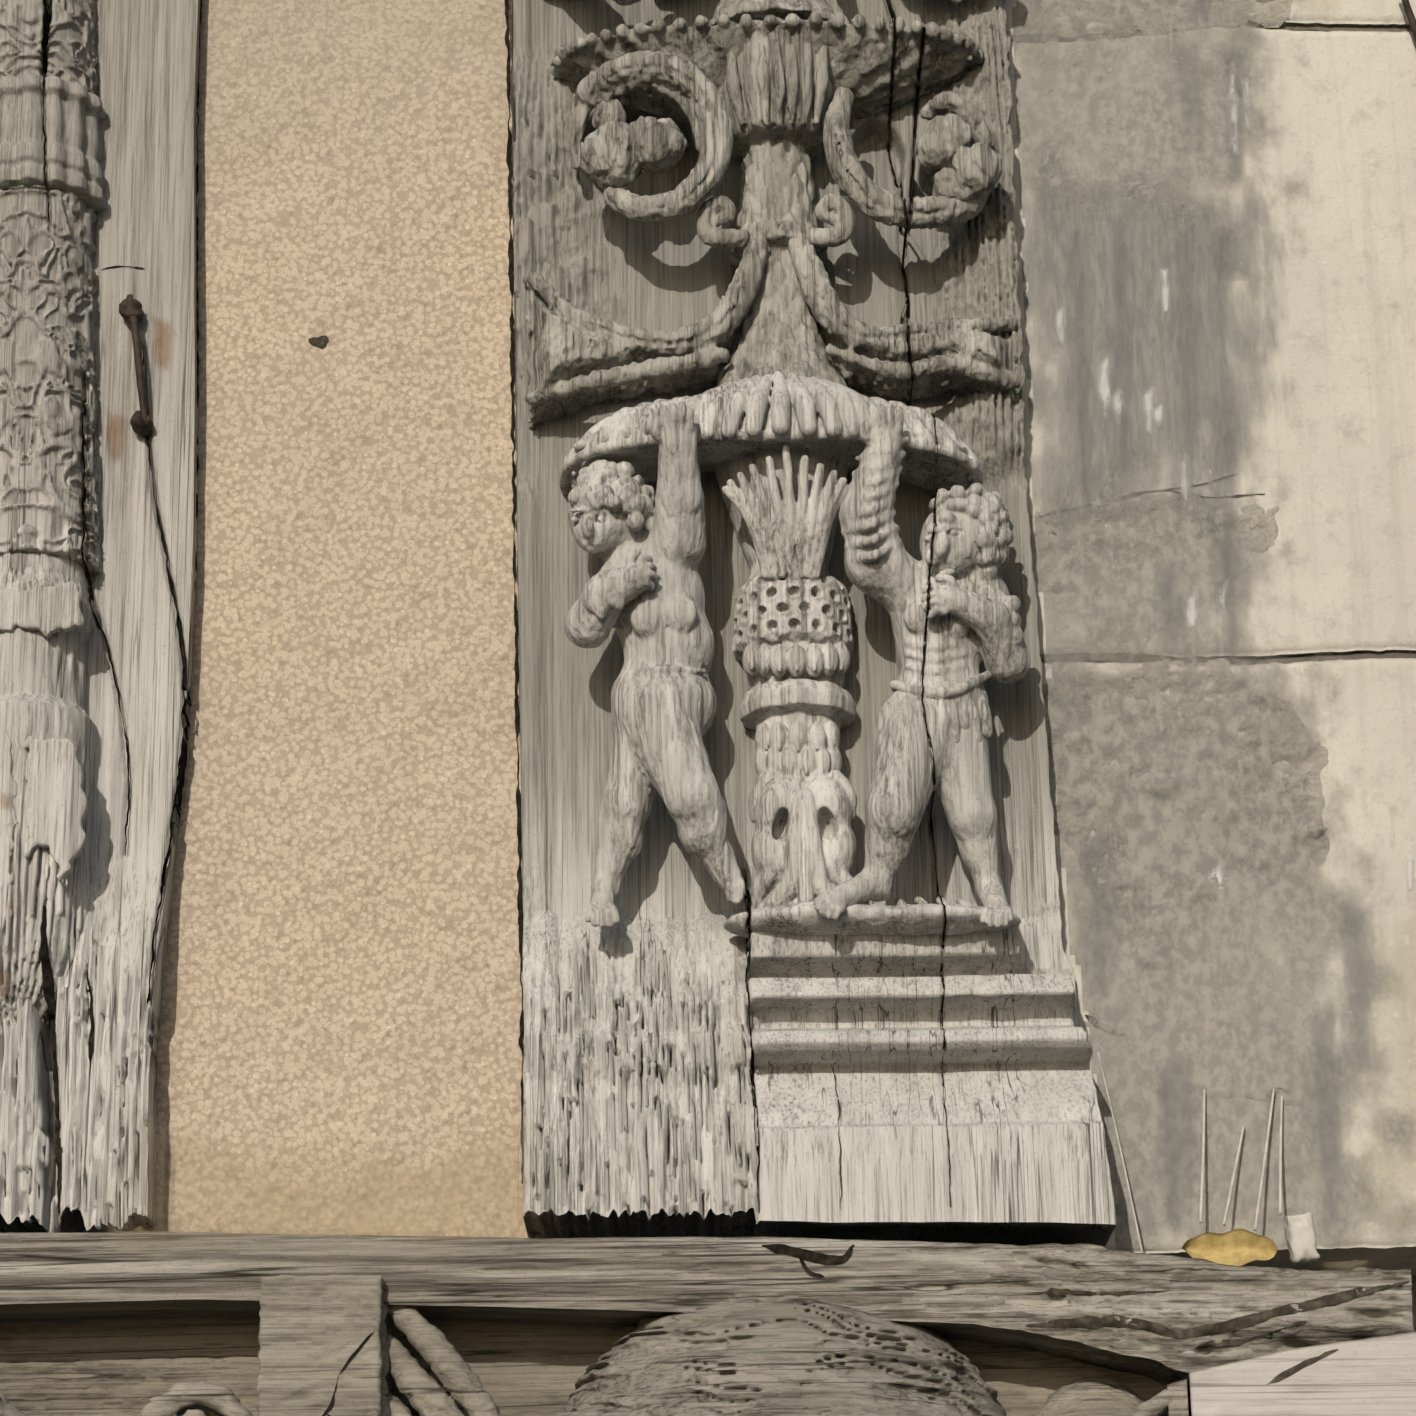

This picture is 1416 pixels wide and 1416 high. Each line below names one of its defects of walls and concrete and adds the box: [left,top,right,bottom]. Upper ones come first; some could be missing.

crack [41,0,52,224]
spalling [1023,0,1170,38]
spalling [1186,0,1294,30]
damp [1010,0,1266,678]
crack [886,0,951,1204]
spalling [1042,684,1123,901]
spalling [1067,658,1245,735]
spalling [1225,693,1330,866]
damp [1047,637,1375,1249]
crack [40,905,95,1214]
crack [322,1332,374,1416]